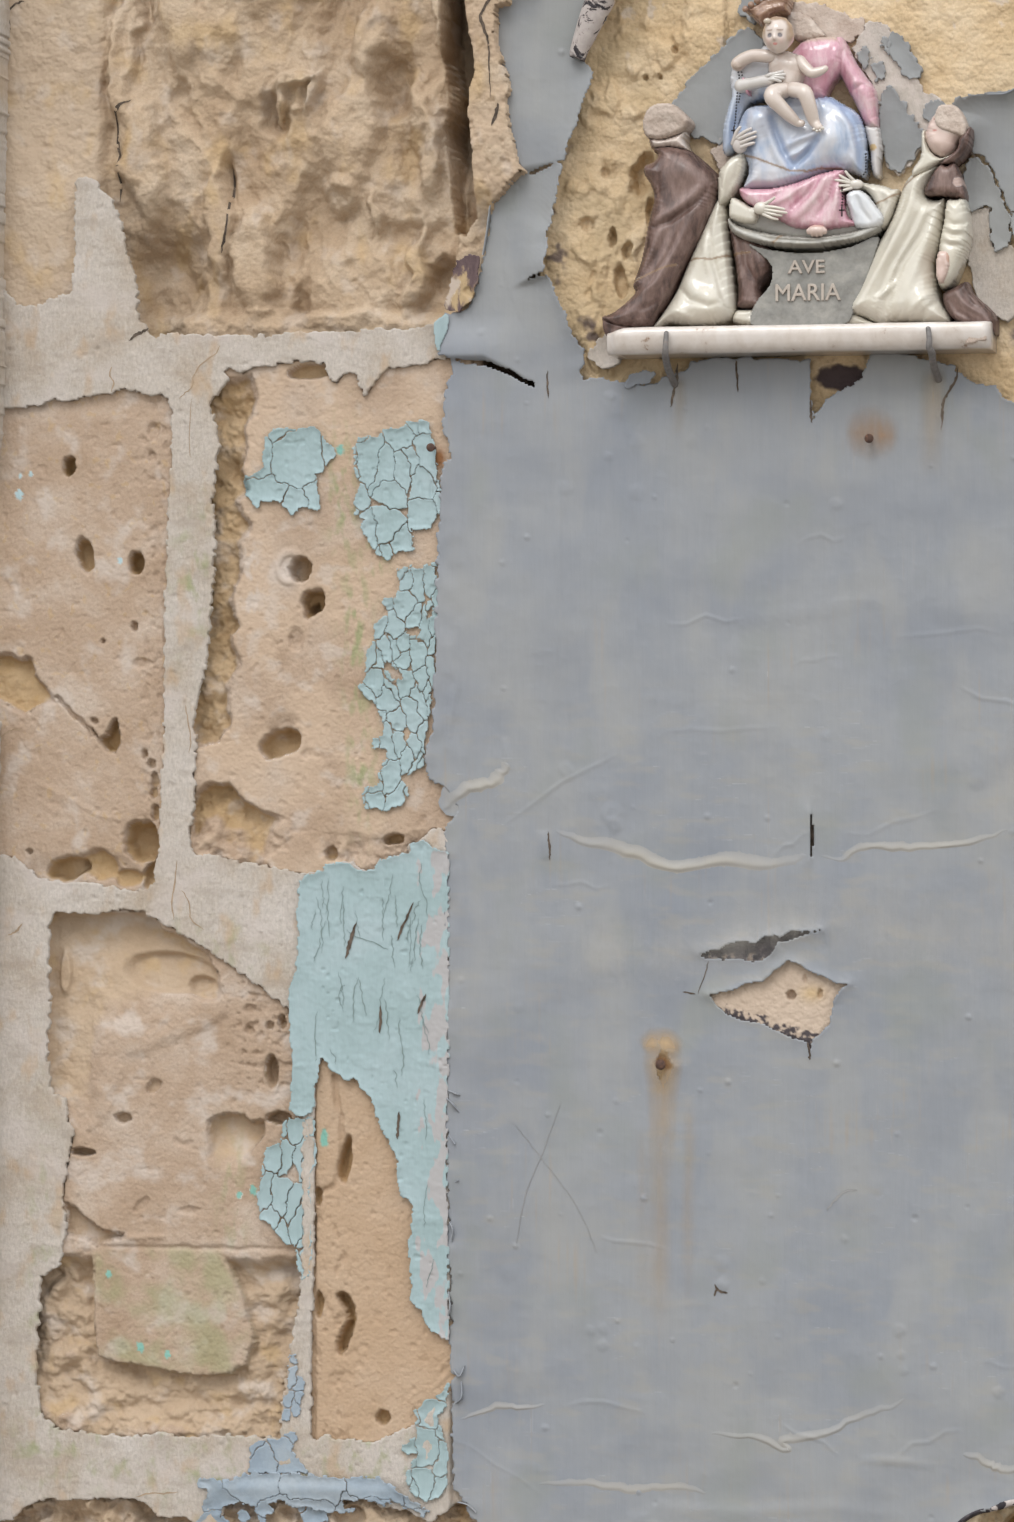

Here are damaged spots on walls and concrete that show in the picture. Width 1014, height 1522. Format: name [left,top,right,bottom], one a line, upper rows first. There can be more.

peeling [786,0,1014,198]
peeling [915,154,1014,402]
peeling [731,355,869,419]
spalling [0,0,766,1522]
peeling [710,960,847,1049]
spalling [958,1499,1014,1522]